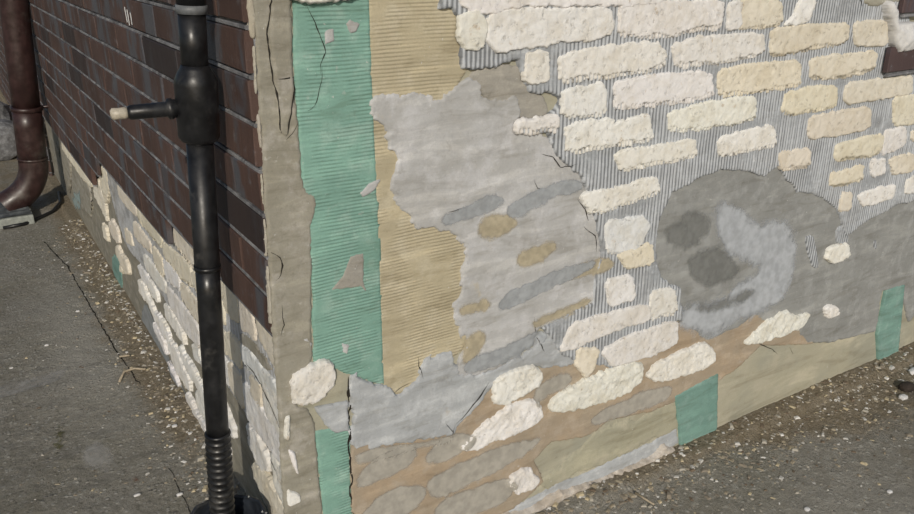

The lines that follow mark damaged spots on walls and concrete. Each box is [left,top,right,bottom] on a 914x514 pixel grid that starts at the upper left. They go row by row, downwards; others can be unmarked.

crack [266,0,326,140]
flaking render [60,144,93,217]
spalling [101,165,201,351]
spalling [269,0,914,514]
spalling [221,281,280,463]
crack [346,377,354,514]